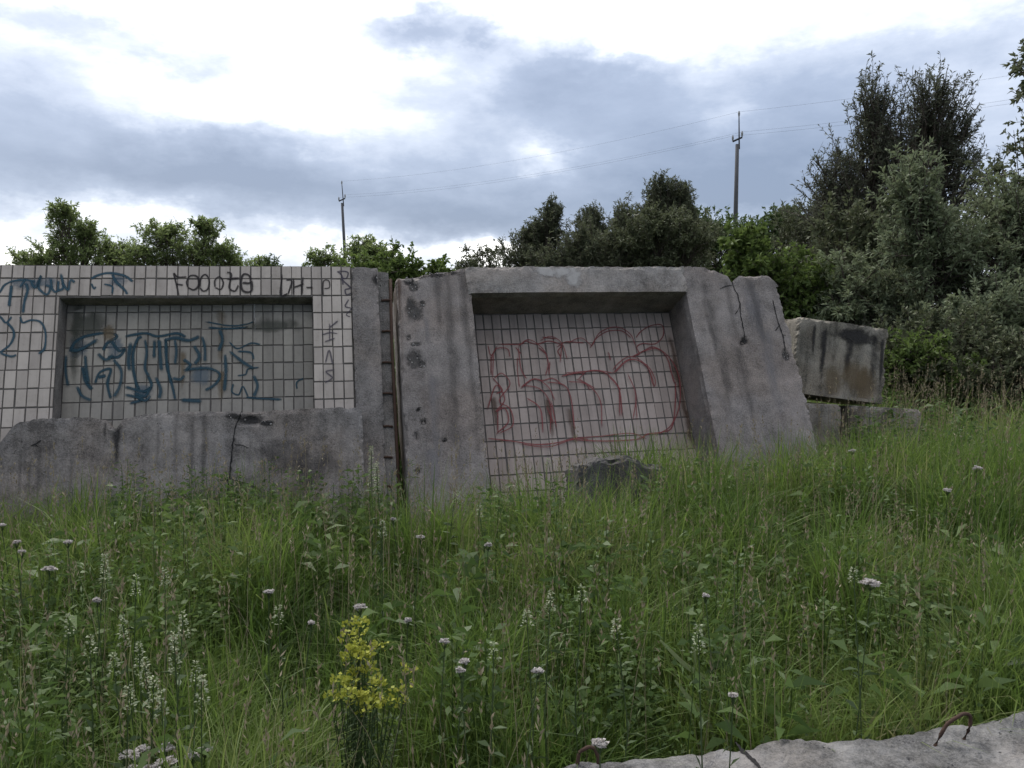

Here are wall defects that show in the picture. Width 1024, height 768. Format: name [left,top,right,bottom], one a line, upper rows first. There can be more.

spalling [407,334,425,368]
crack [720,281,745,339]
crack [773,301,786,358]
water stain [812,325,884,380]
crack [218,411,262,521]